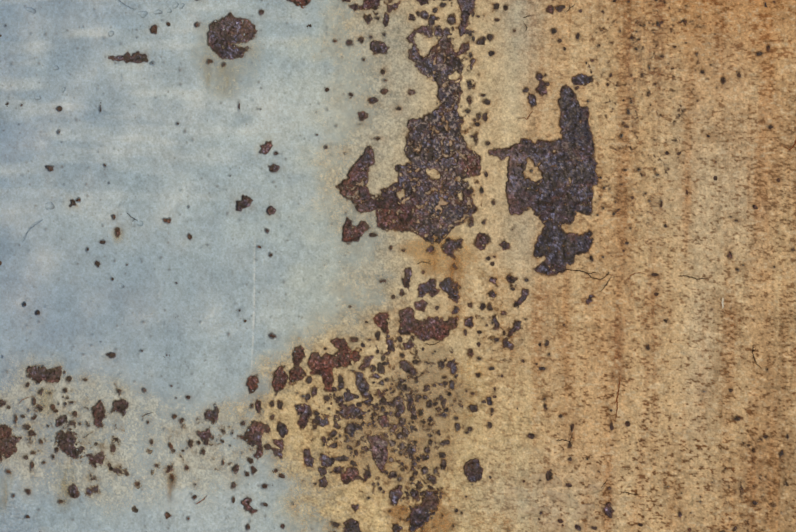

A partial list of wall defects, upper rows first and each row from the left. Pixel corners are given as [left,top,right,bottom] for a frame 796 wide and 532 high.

peeling [337,0,598,275]
rust [218,0,796,532]
rust [0,370,257,513]